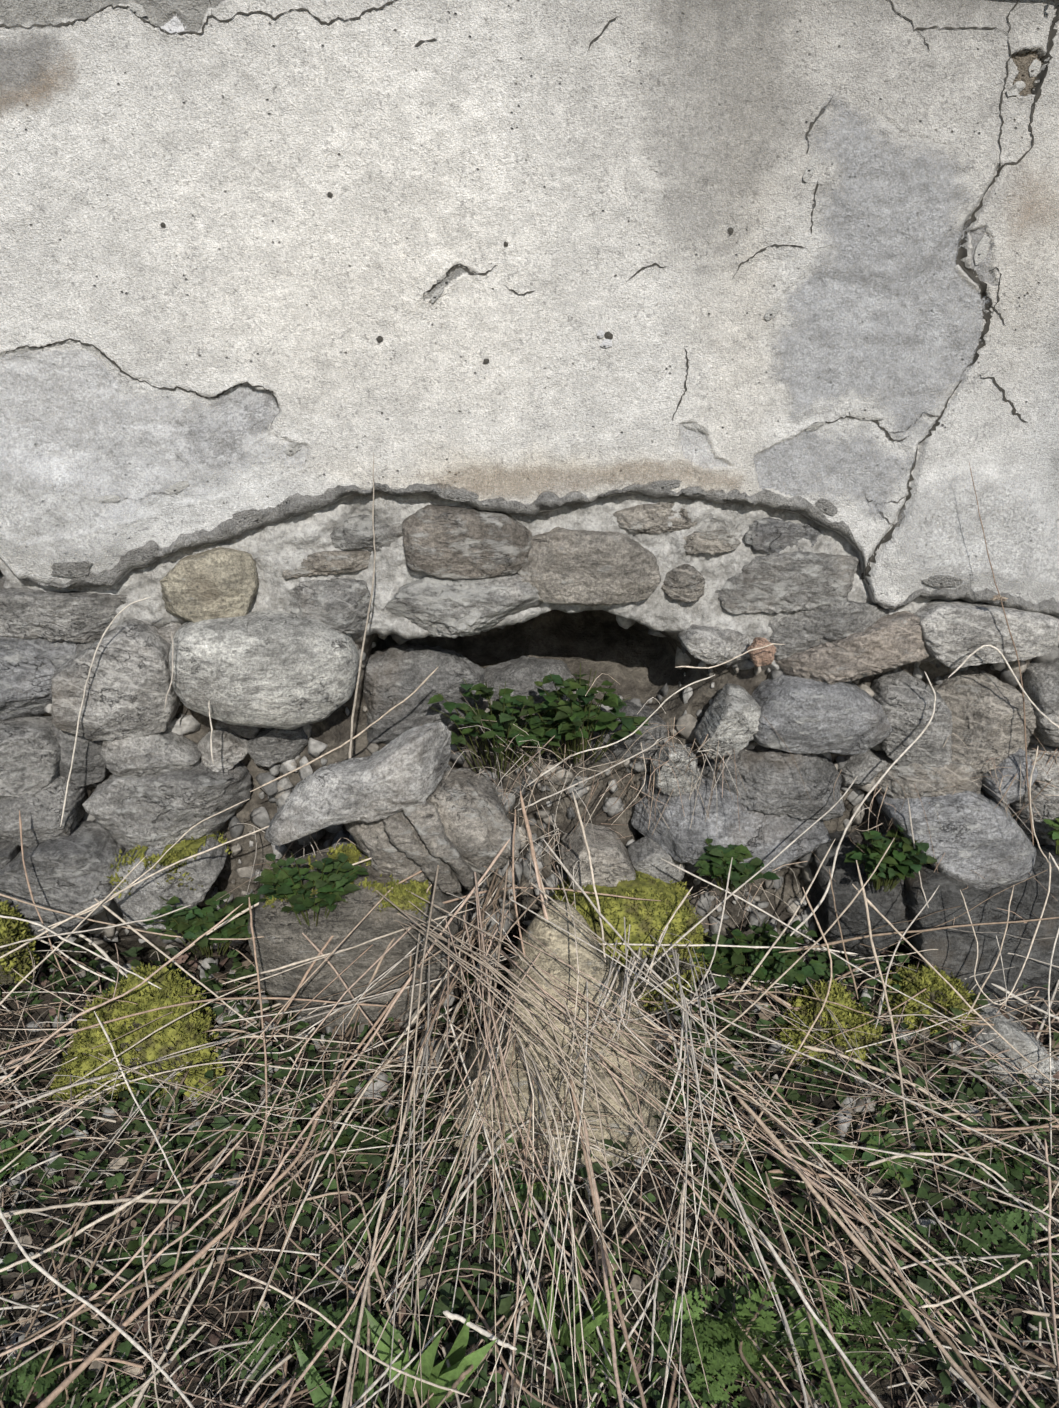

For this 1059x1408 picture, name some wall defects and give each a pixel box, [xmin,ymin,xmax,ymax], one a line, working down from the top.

flaking render [0,0,224,34]
crack [0,0,396,34]
crack [423,264,536,297]
flaking render [764,118,997,430]
crack [812,0,1059,579]
flaking render [0,350,309,535]
flaking render [0,421,1059,616]